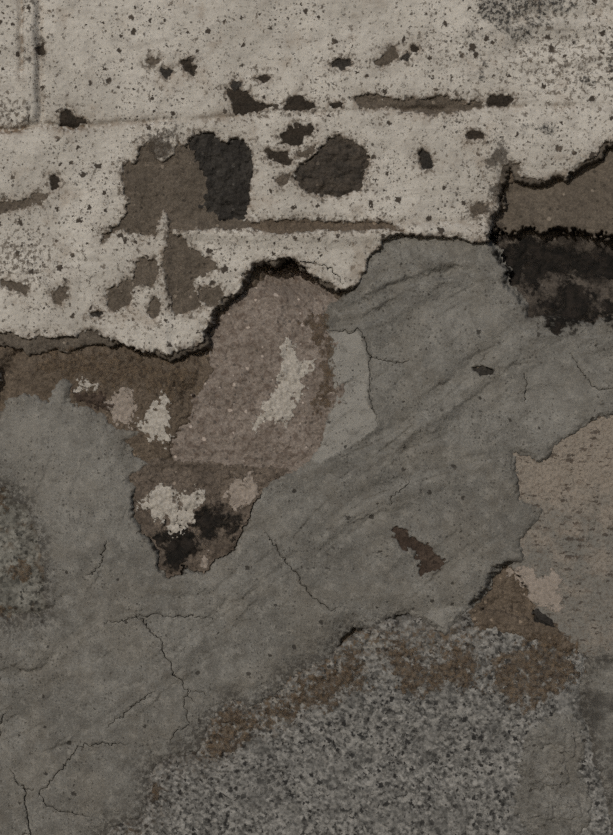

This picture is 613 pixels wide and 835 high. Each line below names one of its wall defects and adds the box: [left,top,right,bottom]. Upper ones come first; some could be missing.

peeling [224,87,273,116]
peeling [284,95,317,111]
peeling [0,175,61,215]
peeling [101,123,405,318]
peeling [0,279,30,296]
leakage [537,280,613,336]
crack [336,327,408,425]
spalling [129,458,289,578]
crack [268,535,340,610]
spalling [391,526,445,577]
crack [103,613,211,740]
crack [10,695,147,835]